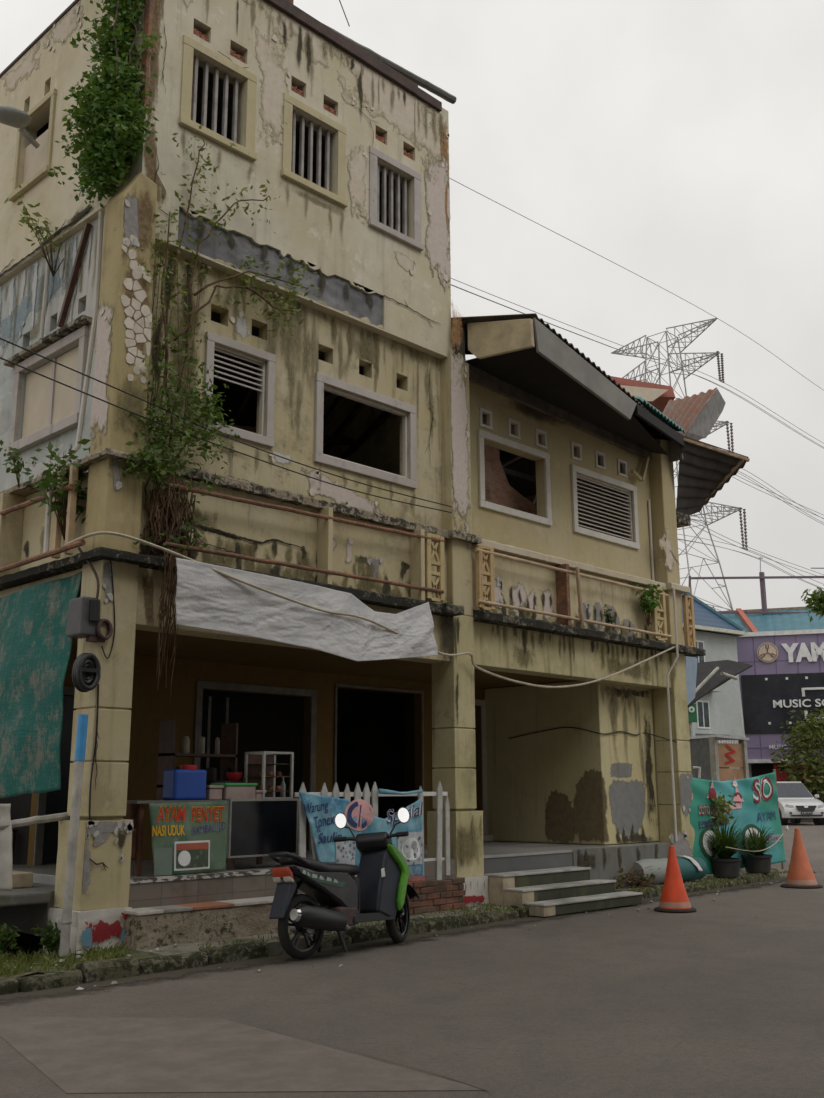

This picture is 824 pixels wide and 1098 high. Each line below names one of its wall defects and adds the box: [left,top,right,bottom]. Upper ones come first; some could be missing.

water stain [237,0,406,113]
peeling [230,0,451,292]
spalling [178,207,385,330]
peeling [450,344,471,549]
peeling [301,468,384,515]
water stain [143,576,153,624]
water stain [140,509,317,582]
water stain [332,555,411,598]
water stain [425,596,460,662]
water stain [492,625,575,668]
water stain [545,641,662,868]
spalling [83,820,133,893]